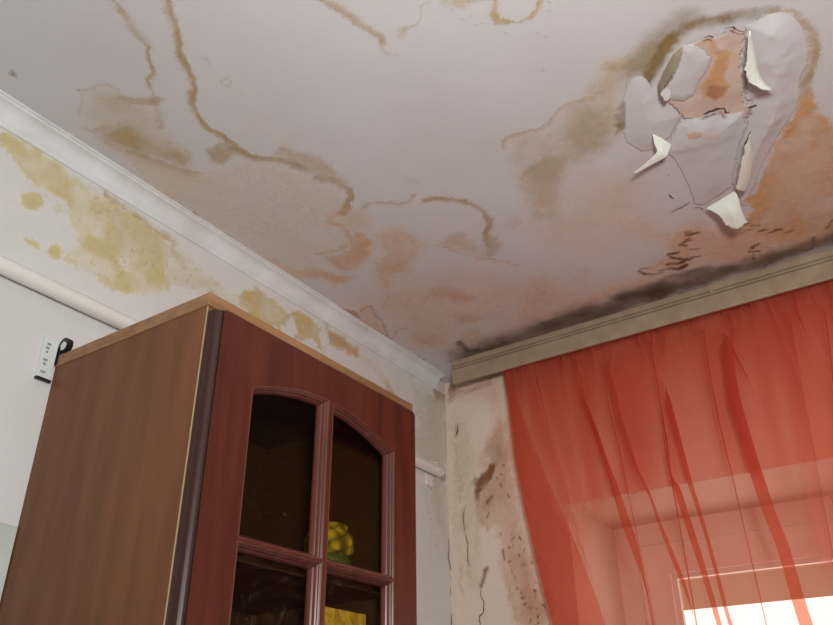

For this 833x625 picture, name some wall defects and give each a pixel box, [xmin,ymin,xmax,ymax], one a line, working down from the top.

leakage [321,0,385,44]
leakage [490,0,542,24]
leakage [0,133,76,213]
leakage [81,192,211,293]
leakage [105,124,195,175]
leakage [165,0,354,216]
leakage [423,196,492,247]
leakage [459,8,833,357]
peeling [621,8,811,230]
leakage [240,288,358,357]
leakage [478,425,509,521]
crack [448,505,470,591]